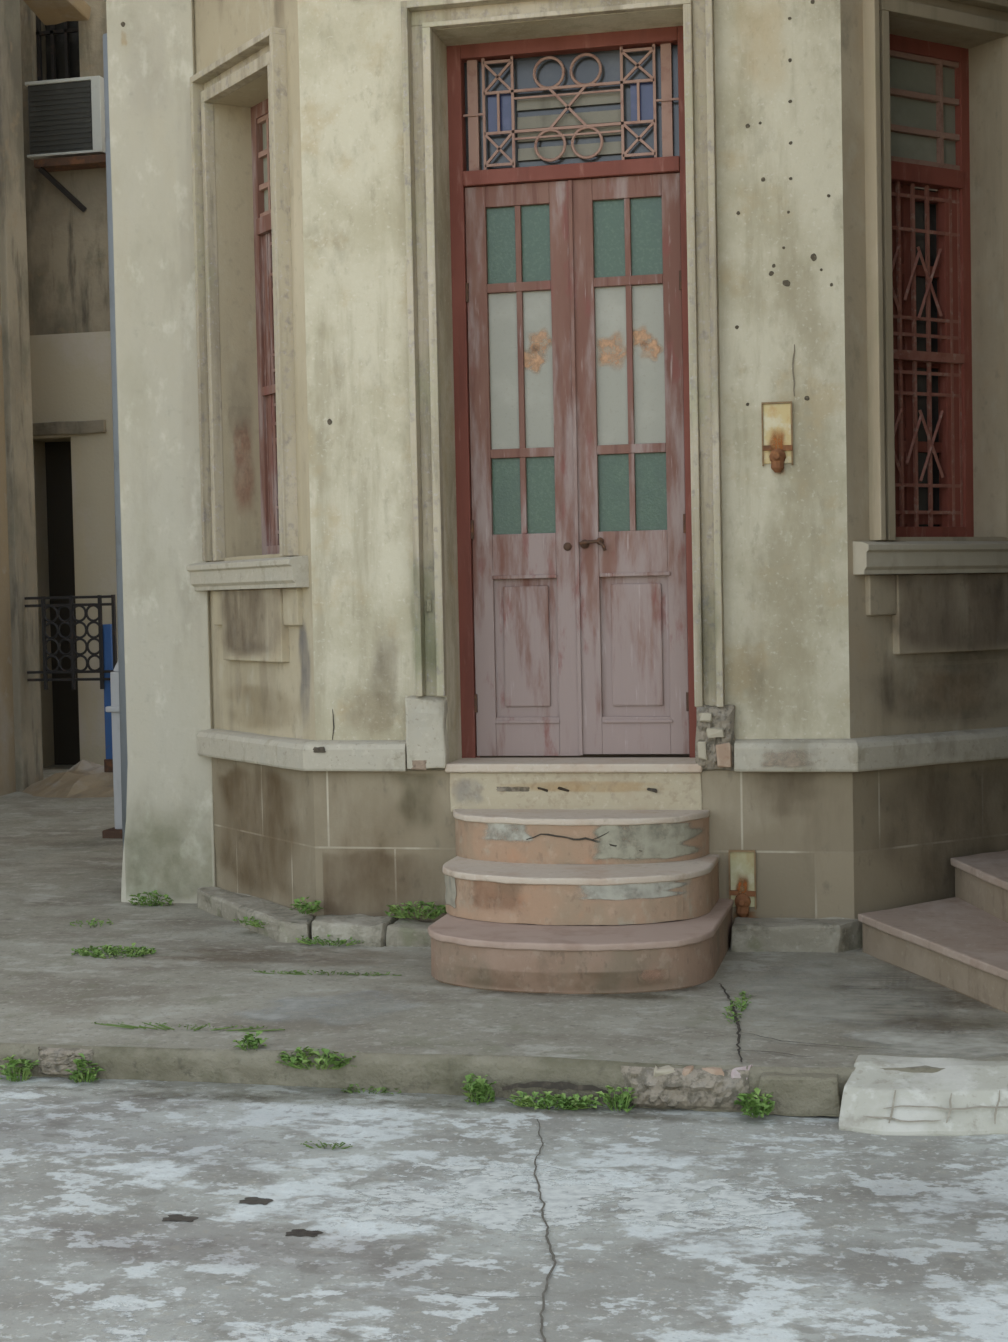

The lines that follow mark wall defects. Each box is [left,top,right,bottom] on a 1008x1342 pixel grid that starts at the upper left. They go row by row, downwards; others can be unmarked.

spalling [696,707,734,770]
crack [526,832,642,852]
crack [719,983,900,1062]
spalling [621,1064,753,1111]
crack [863,1090,1008,1124]
crack [420,1081,608,1342]